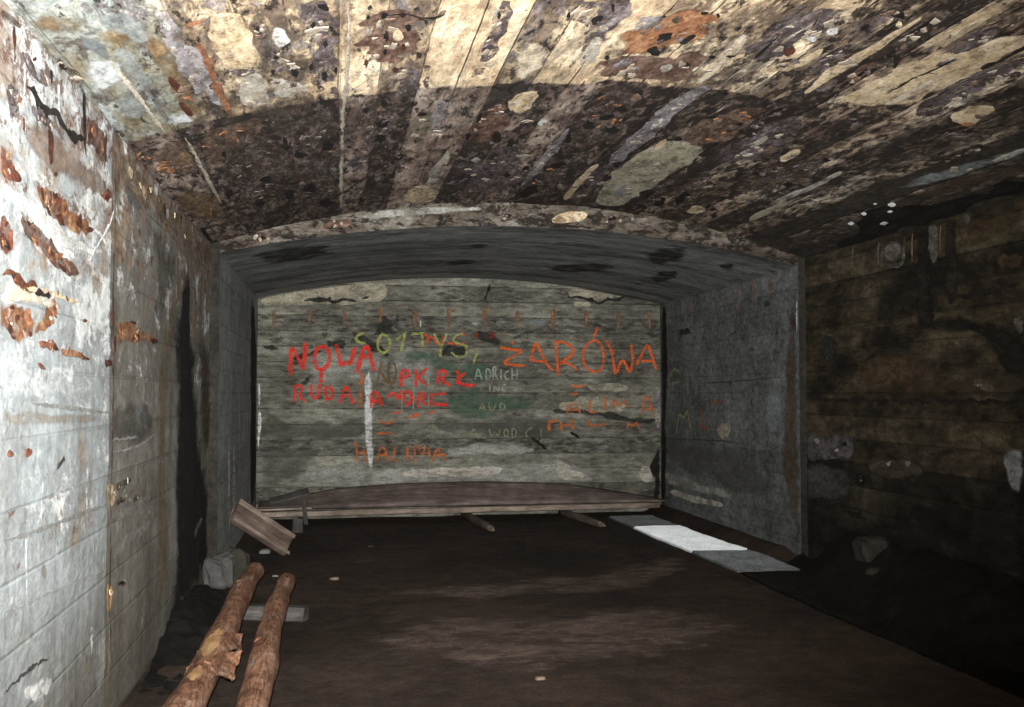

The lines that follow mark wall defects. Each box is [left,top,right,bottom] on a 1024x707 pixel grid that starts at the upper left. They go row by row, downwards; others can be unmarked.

crack [27,86,85,144]
spalling [136,0,447,229]
peeling [403,0,1024,226]
spalling [1,146,22,182]
spalling [0,216,79,277]
spalling [37,185,94,236]
spalling [1,287,90,360]
spalling [117,321,158,344]
damp [112,239,207,603]
damp [811,450,1024,584]